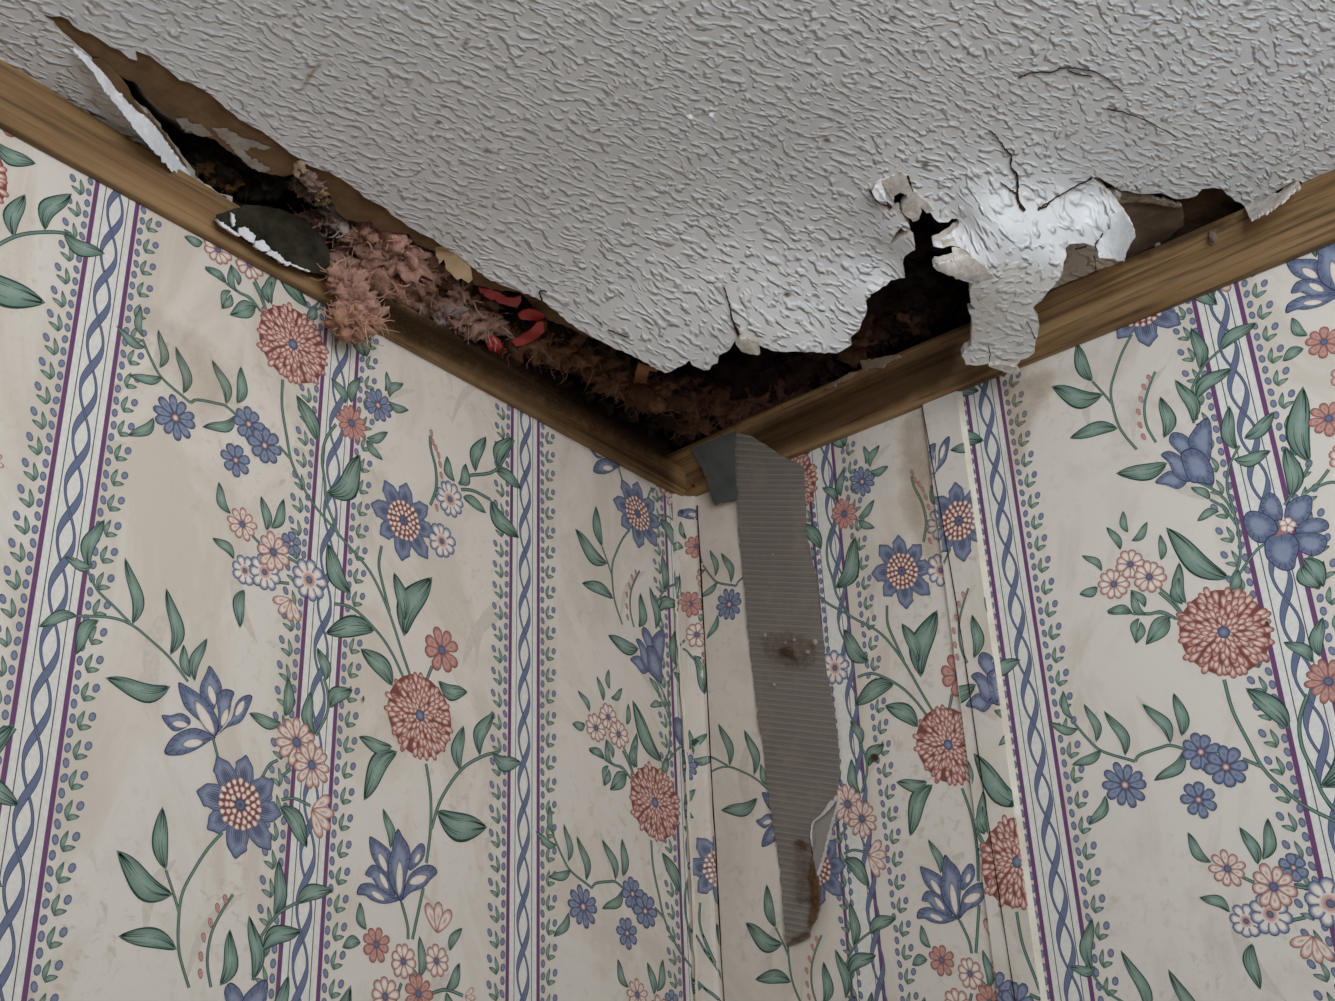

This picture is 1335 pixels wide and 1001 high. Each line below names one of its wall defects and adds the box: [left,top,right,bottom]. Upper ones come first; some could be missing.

crack [989,130,1092,211]
spalling [214,212,310,272]
peeling [880,92,1136,375]
peeling [735,334,760,355]